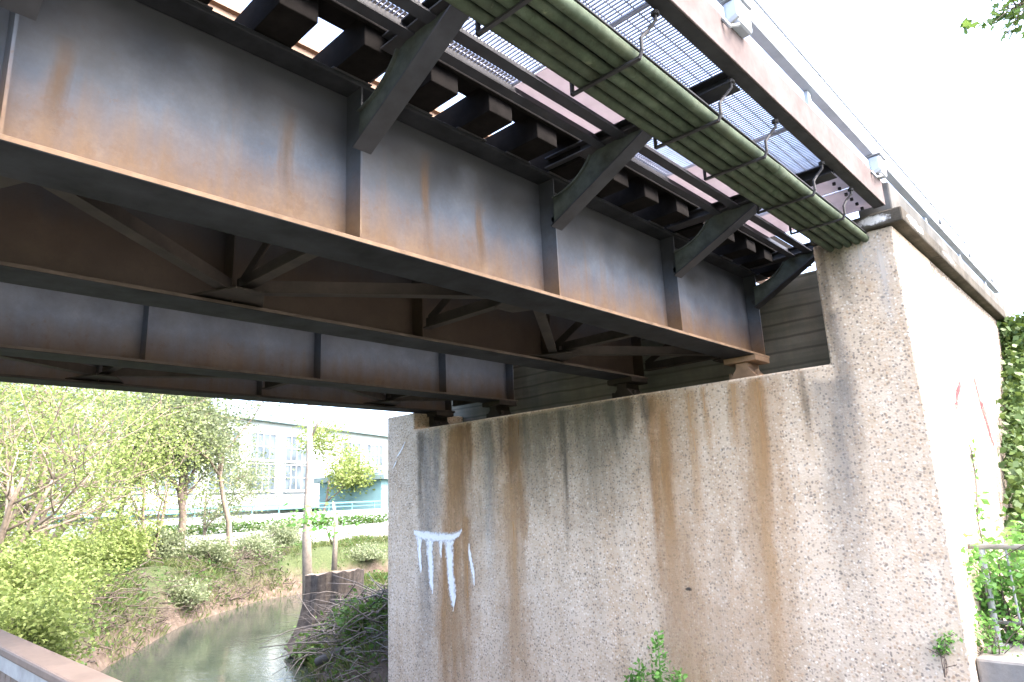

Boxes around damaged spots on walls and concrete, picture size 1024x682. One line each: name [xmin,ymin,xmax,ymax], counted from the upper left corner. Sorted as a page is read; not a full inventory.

rust [442,533,468,631]